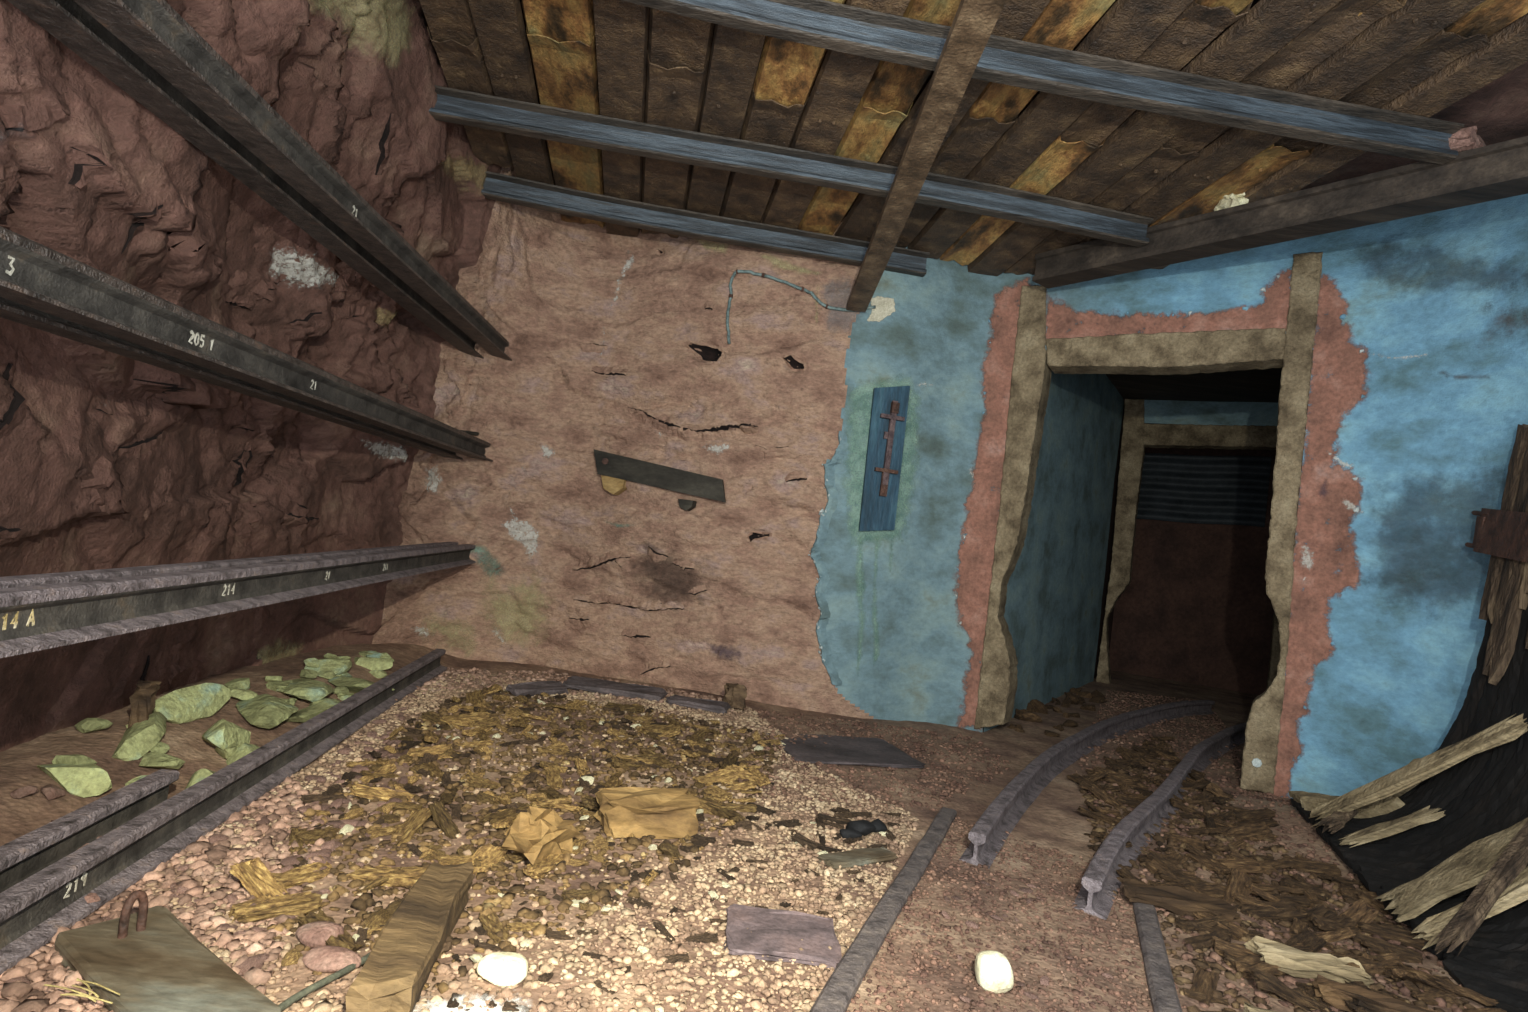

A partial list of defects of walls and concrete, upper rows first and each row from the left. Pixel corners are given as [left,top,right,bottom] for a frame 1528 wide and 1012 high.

crack [579,343,807,482]
peeling [808,431,850,686]
spalling [953,277,1032,728]
spalling [1046,267,1292,339]
spalling [1274,274,1368,798]